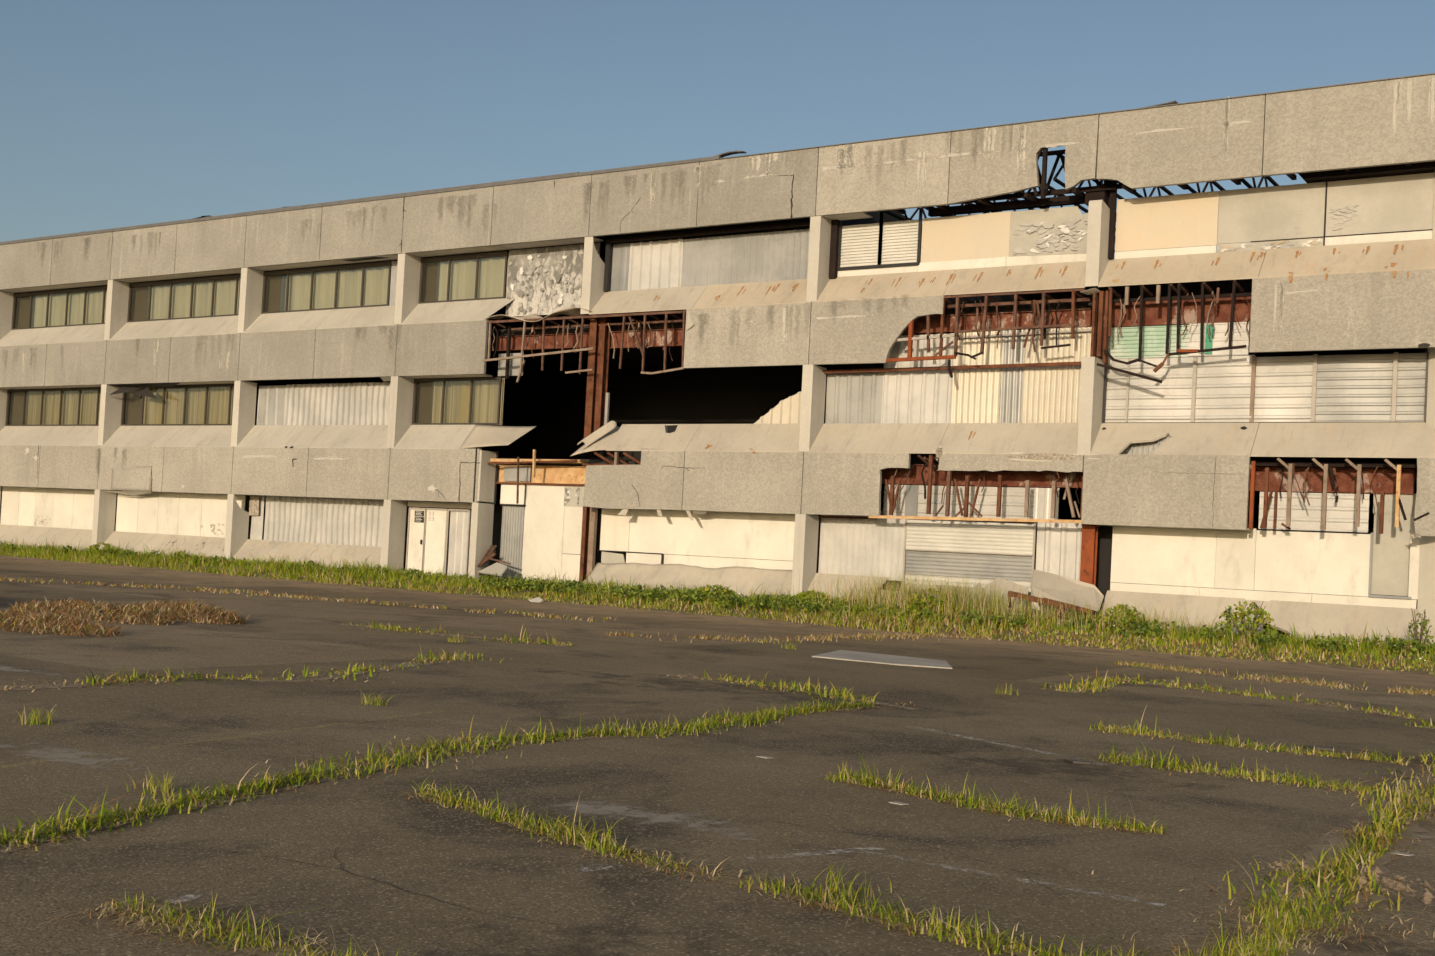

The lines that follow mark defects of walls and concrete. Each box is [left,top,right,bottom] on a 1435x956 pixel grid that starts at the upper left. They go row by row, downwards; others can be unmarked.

peeling [1012,218,1088,255]
peeling [506,250,598,315]